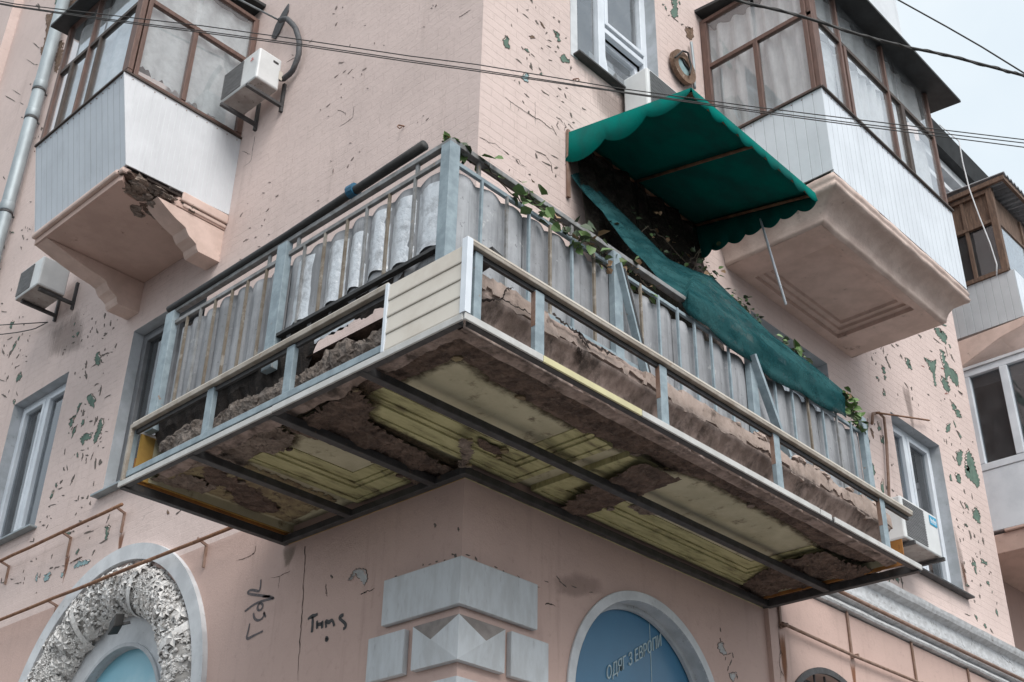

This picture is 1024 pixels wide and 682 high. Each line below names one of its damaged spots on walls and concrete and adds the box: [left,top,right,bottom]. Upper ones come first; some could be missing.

peeling [502,0,572,114]
spalling [118,170,201,220]
spalling [482,274,531,321]
peeling [0,303,118,593]
spalling [150,310,903,600]
peeling [871,324,998,634]
crack [274,548,328,660]